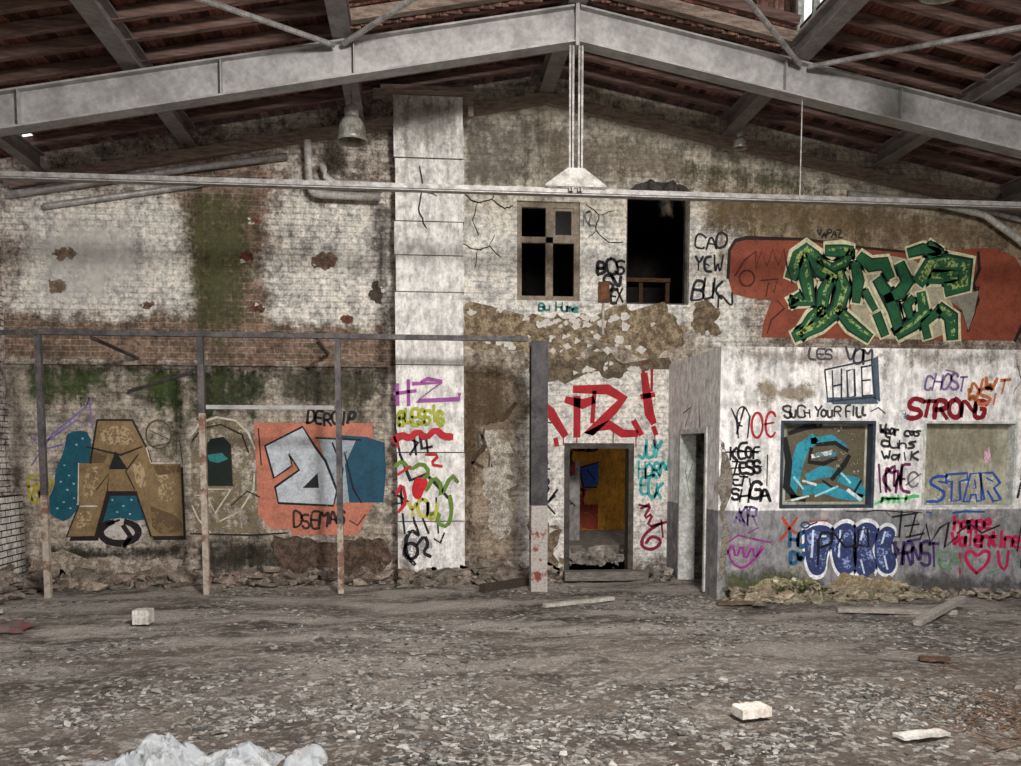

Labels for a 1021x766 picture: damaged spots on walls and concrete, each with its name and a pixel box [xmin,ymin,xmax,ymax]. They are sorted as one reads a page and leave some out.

peeling [463,300,722,384]
damp [205,366,219,429]
peeling [481,422,521,539]